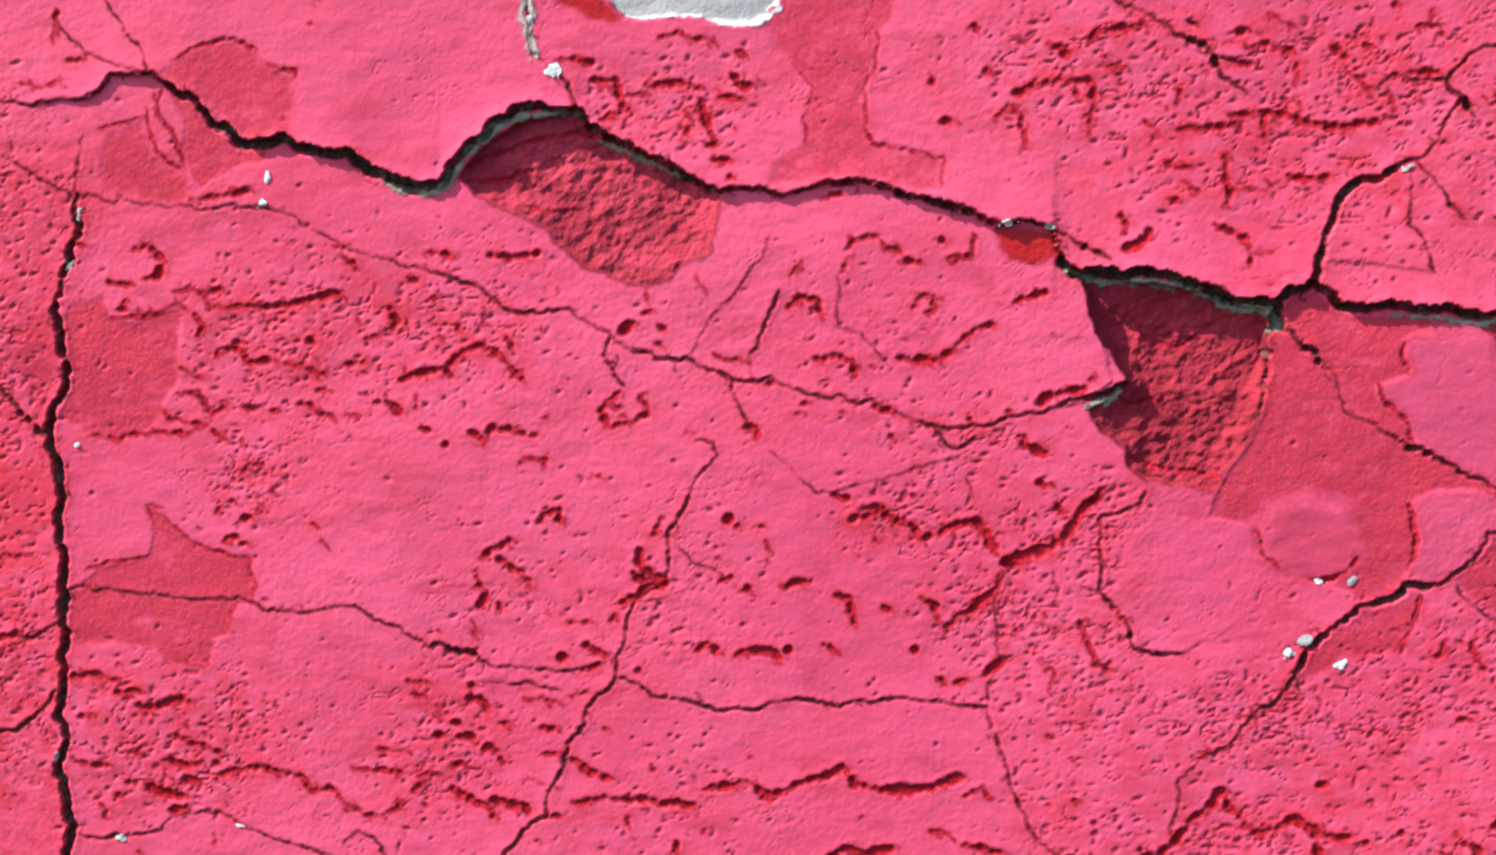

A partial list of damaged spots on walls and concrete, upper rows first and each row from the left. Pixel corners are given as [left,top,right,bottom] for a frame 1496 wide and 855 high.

flaking render [458,105,720,288]
crack [11,0,1496,494]
spalling [610,0,945,187]
crack [0,136,396,855]
crack [429,440,1057,855]
crack [1099,492,1181,656]
peeling [1080,275,1496,675]
crack [1168,532,1496,835]